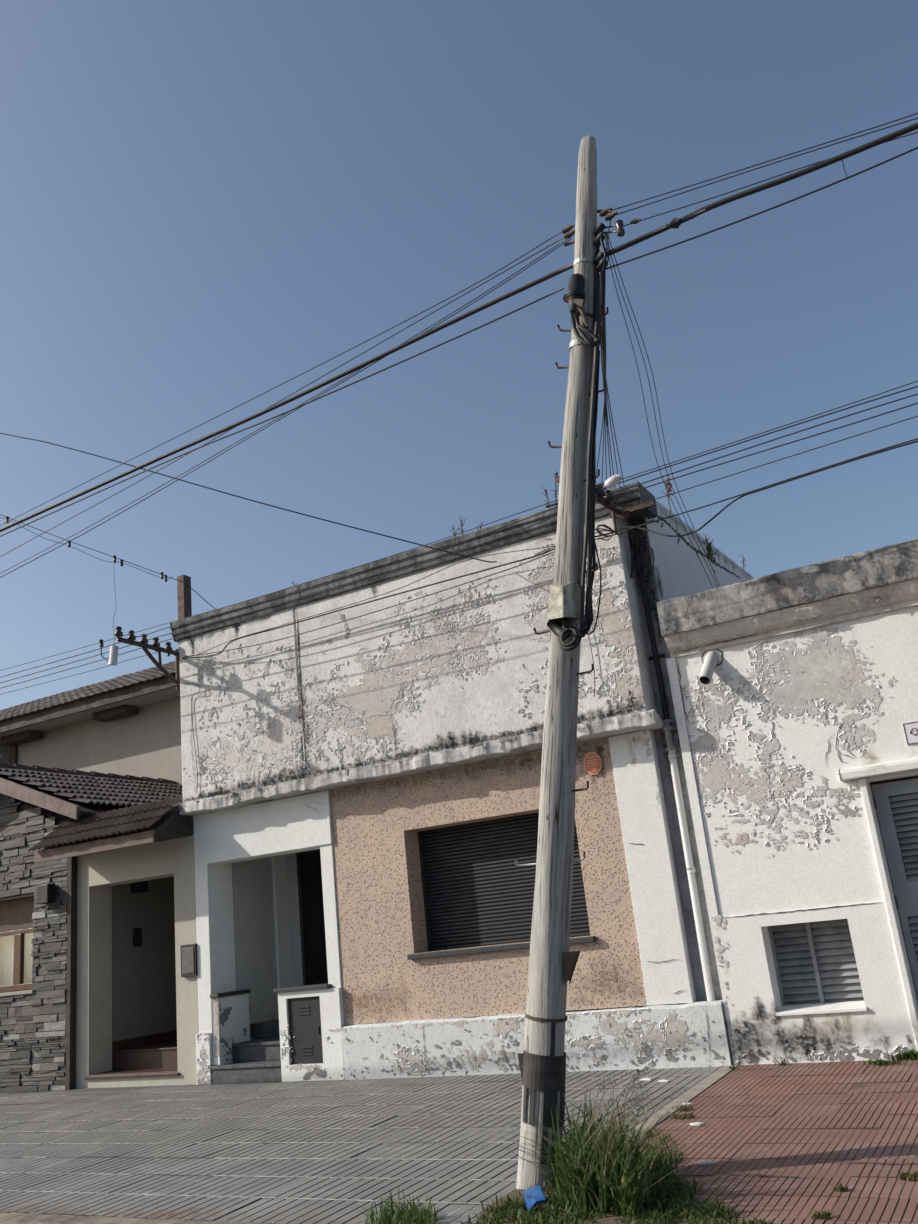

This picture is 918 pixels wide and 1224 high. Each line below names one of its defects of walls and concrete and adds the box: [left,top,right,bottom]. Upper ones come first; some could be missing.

peeling [184,578,506,796]
water stain [180,723,543,810]
water stain [576,691,652,757]
peeling [681,624,897,858]
peeling [564,1008,906,1071]
water stain [732,1001,851,1063]